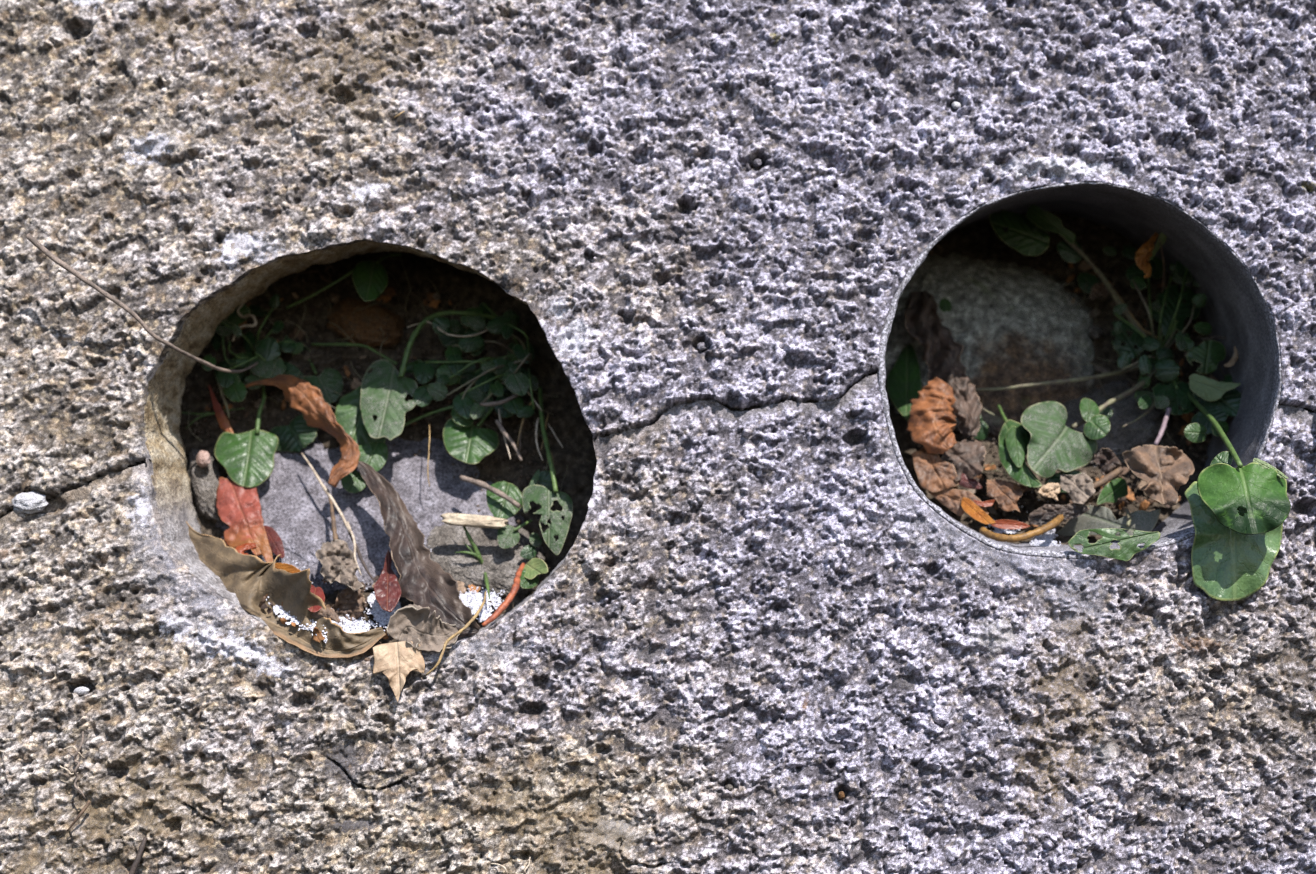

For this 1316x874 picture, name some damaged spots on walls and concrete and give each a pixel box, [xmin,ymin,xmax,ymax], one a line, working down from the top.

crack [722,362,877,411]
crack [1,459,152,517]